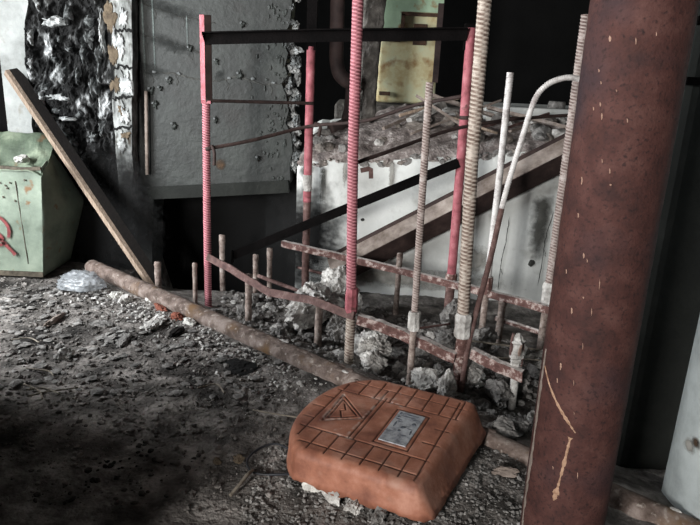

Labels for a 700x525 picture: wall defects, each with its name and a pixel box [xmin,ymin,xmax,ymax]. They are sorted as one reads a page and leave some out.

spalling [268,0,301,30]
spalling [24,0,134,191]
spalling [259,43,348,173]
spalling [359,153,451,168]
spalling [479,149,531,160]
leakage [531,198,550,252]